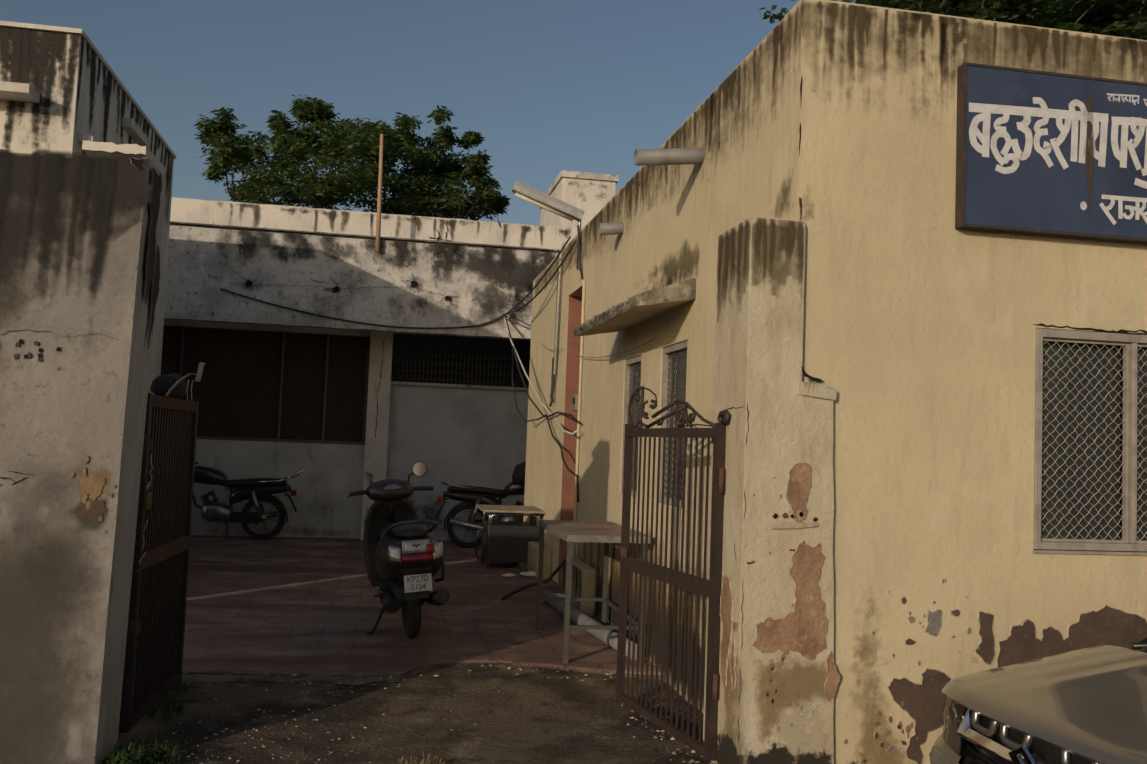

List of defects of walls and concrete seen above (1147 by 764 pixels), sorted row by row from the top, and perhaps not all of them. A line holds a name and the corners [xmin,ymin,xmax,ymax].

damp [660,1,1147,150]
damp [0,26,173,306]
damp [218,165,680,323]
damp [717,181,803,320]
spalling [69,455,115,528]
damp [0,540,73,764]
peeling [719,572,738,692]
damp [716,657,832,764]
peeling [751,462,840,731]
peeling [873,661,951,764]
peeling [901,597,961,645]
peeling [952,604,1147,668]